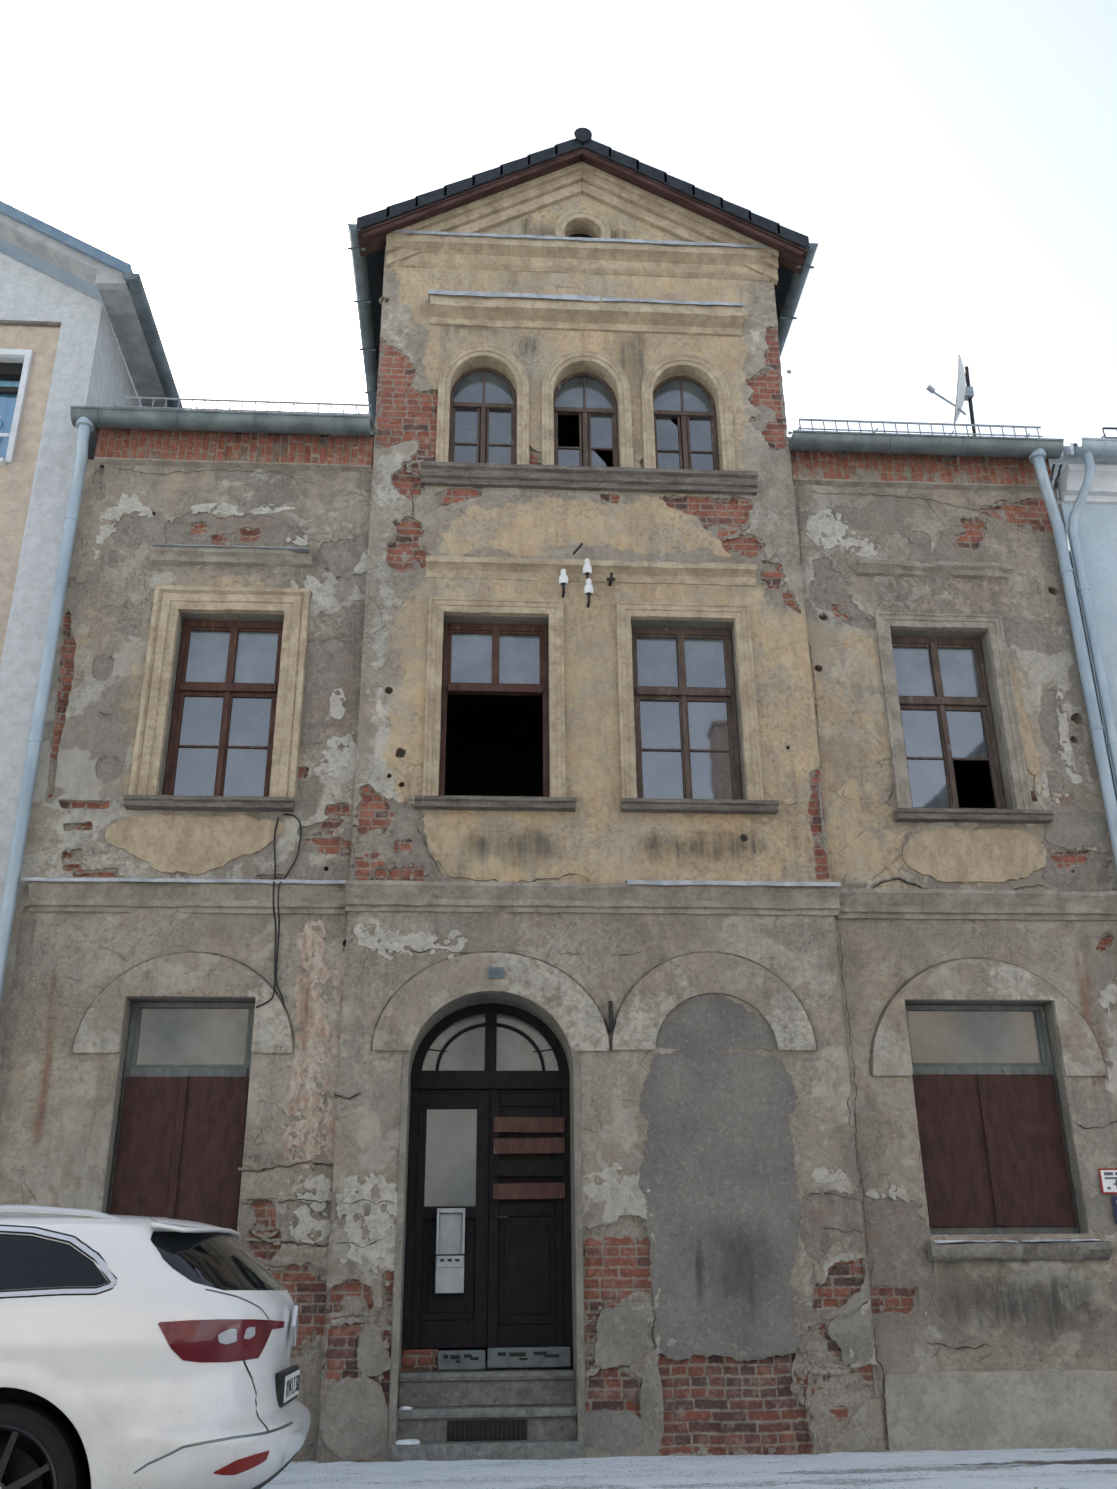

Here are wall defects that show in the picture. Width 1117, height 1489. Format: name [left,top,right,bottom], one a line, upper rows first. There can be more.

peeling [92,465,155,568]
flaking render [373,338,483,573]
flaking render [660,494,881,630]
flaking render [954,497,1059,551]
flaking render [47,607,123,878]
flaking render [297,638,441,882]
flaking render [808,766,830,880]
crack [869,876,931,889]
crack [1002,882,1044,890]
peeling [237,918,468,1406]
flaking render [575,1163,653,1419]
flaking render [657,1167,937,1456]